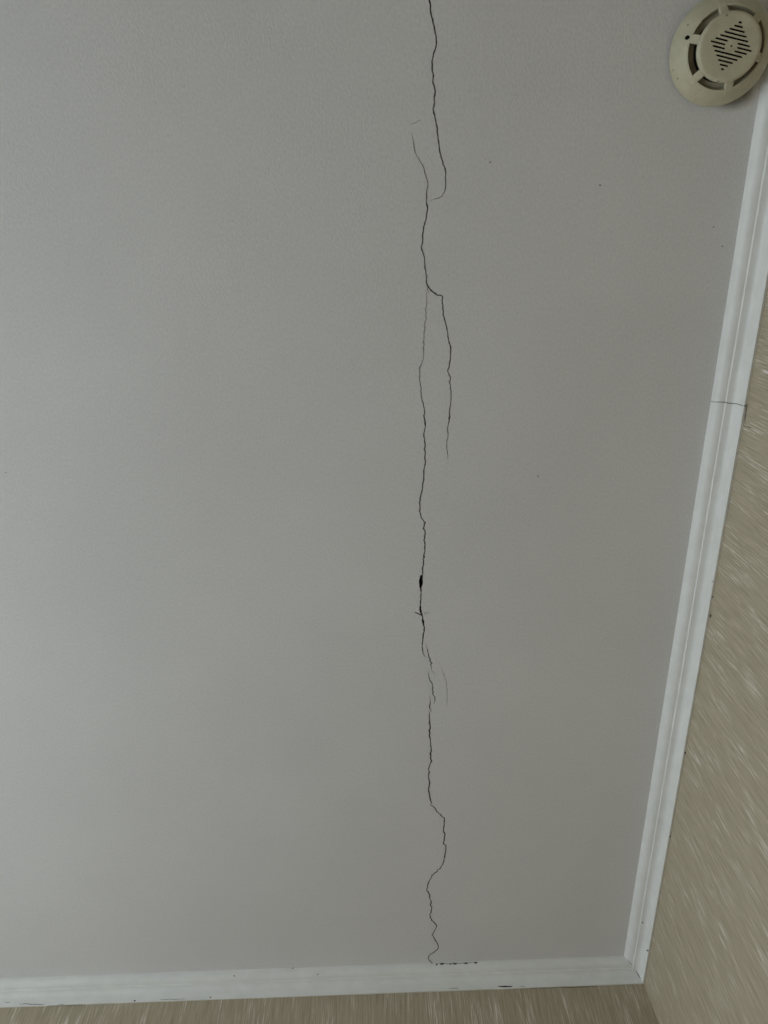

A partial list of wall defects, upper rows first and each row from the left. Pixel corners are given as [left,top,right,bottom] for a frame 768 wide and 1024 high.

crack [412,0,477,965]